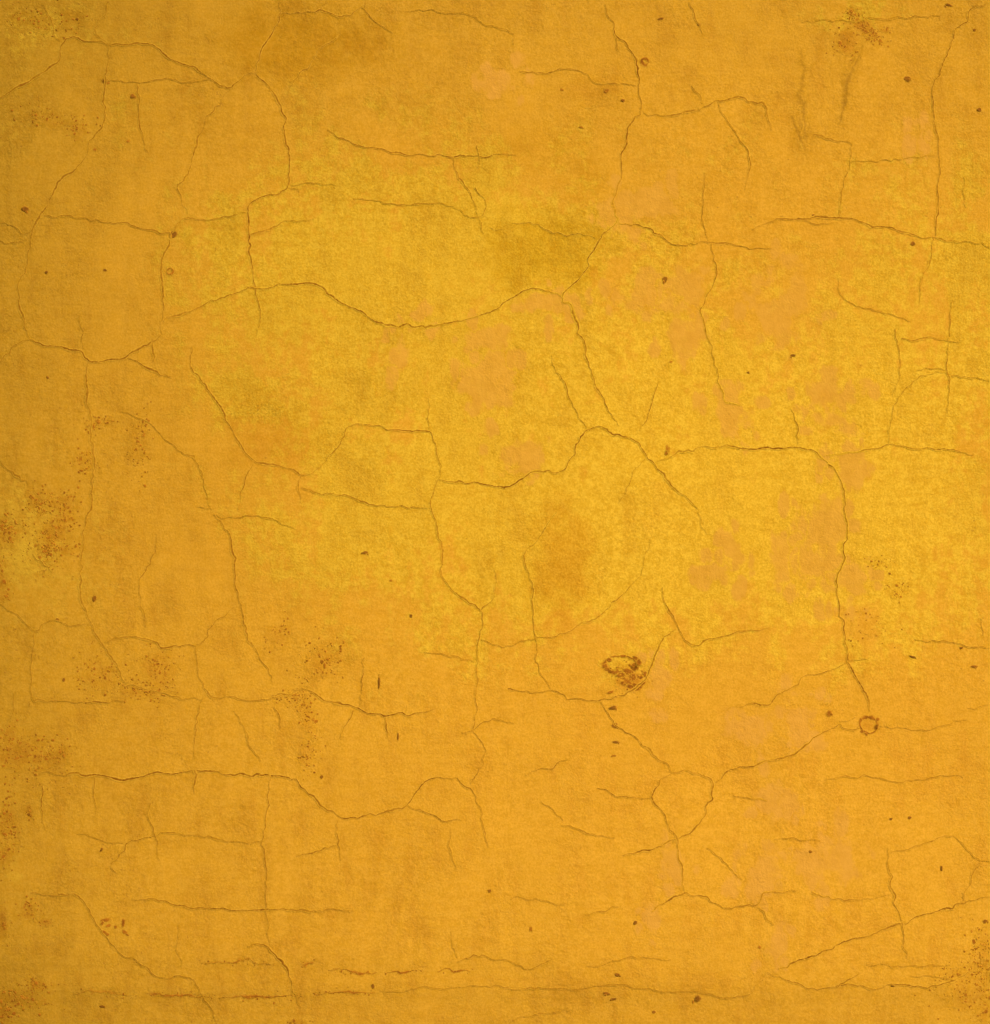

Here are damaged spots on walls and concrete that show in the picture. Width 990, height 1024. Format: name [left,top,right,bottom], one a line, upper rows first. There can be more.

crack [752,2,990,305]
crack [838,279,911,322]
crack [0,1,773,759]
crack [42,300,990,1009]
rust [601,654,653,757]
rust [857,714,880,736]
crack [31,891,217,1024]